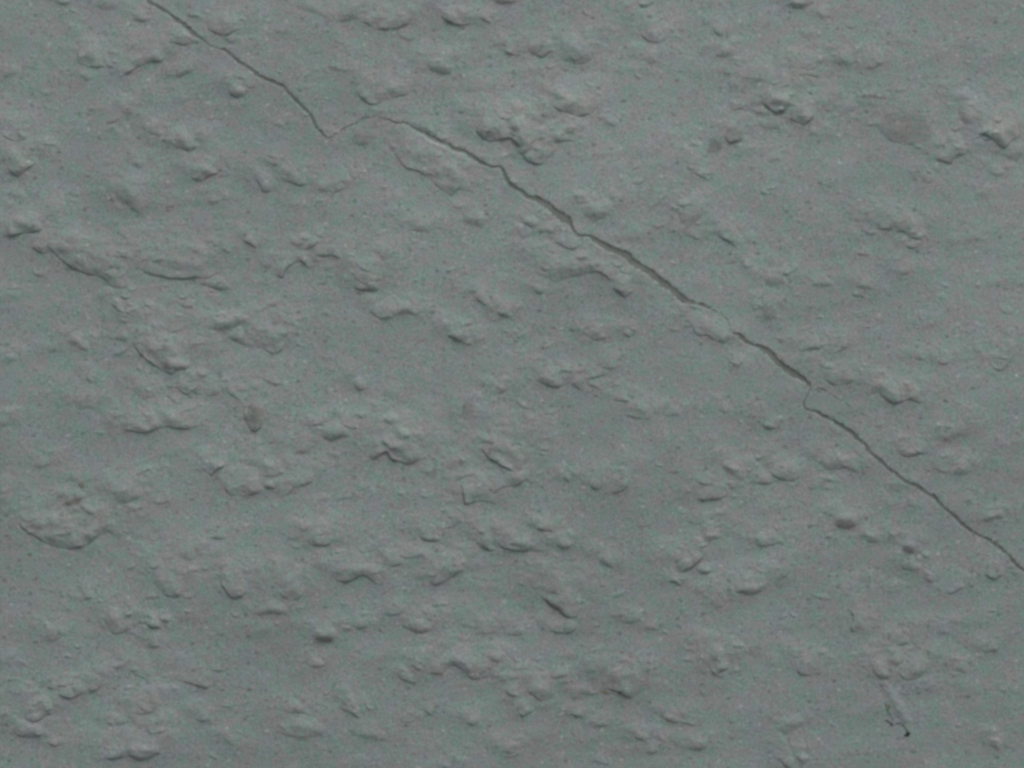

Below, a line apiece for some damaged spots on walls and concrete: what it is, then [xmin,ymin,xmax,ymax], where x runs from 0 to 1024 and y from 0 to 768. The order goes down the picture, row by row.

crack [146,0,1024,572]